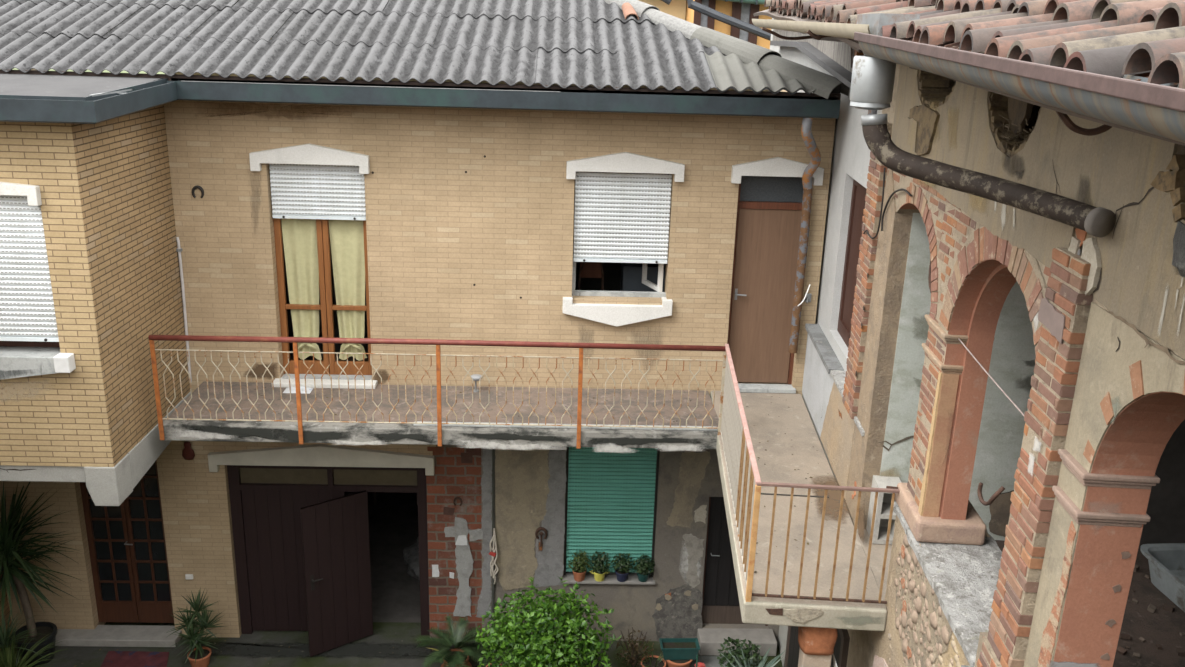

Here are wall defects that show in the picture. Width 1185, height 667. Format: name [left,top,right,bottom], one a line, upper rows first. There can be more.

spalling [905,70,955,156]
spalling [988,91,1042,157]
spalling [1150,154,1185,222]
water stain [179,424,432,445]
water stain [460,433,563,450]
water stain [591,438,701,452]